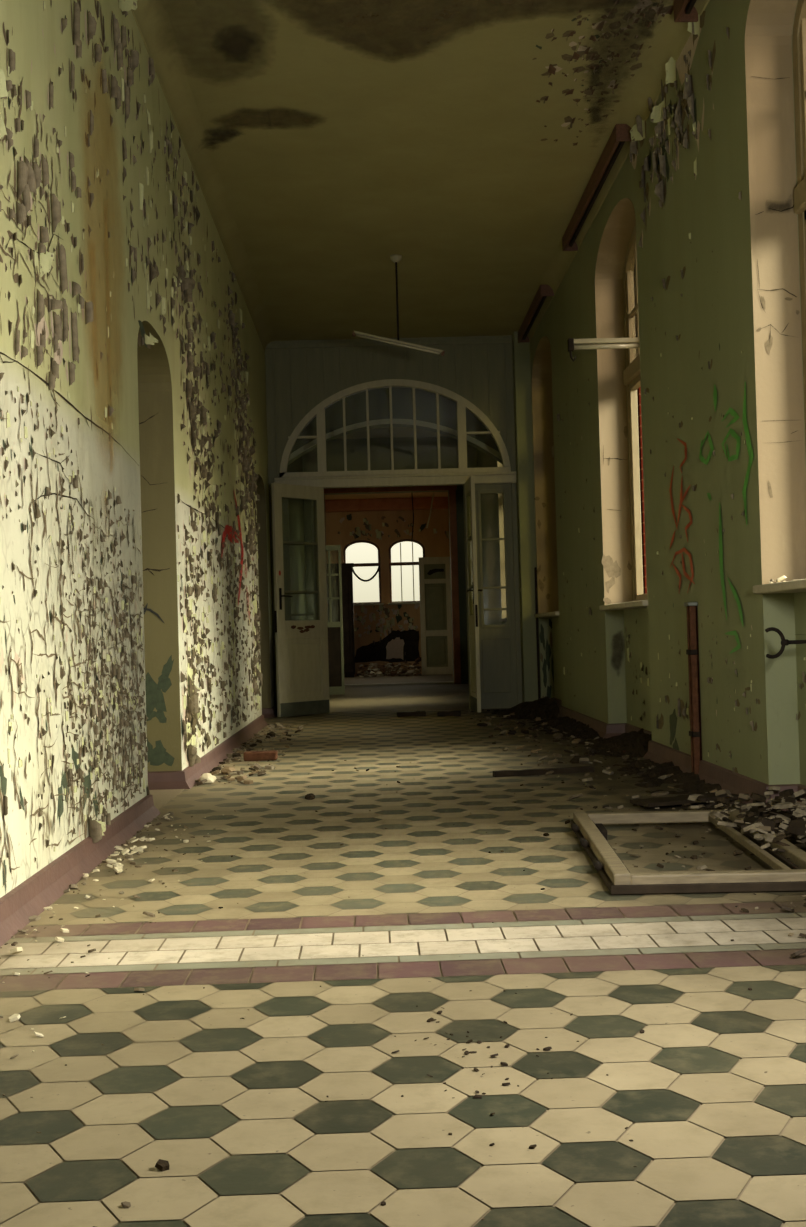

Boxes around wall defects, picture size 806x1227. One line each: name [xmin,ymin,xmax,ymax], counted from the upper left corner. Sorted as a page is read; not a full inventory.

leakage [207,109,319,146]
leakage [279,0,655,120]
peeling [532,0,674,146]
peeling [629,10,730,248]
crack [0,352,224,528]
peeling [0,0,263,894]